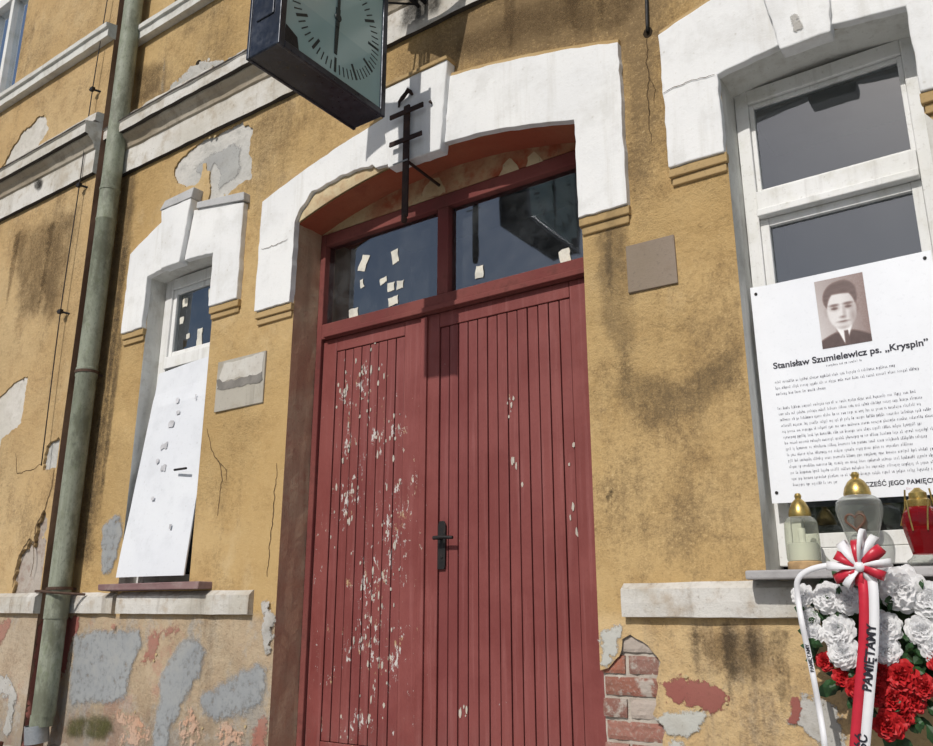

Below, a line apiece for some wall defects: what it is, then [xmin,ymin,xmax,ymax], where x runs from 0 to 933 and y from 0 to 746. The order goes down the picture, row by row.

spalling [170,49,246,89]
peeling [4,115,49,166]
peeling [175,122,253,199]
peeling [0,377,28,444]
crack [207,429,227,516]
crack [12,458,54,587]
crack [267,463,277,570]
flaking render [602,635,730,746]